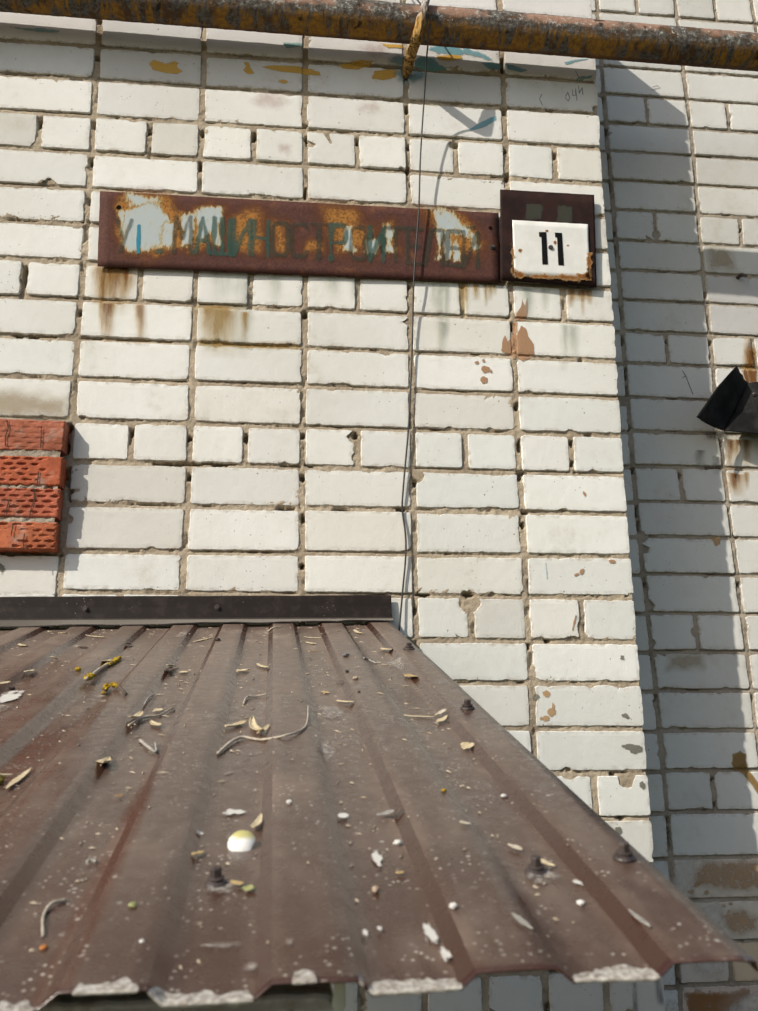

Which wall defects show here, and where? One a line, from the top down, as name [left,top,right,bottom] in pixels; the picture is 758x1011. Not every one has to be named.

corrosion [97,267,129,326]
corrosion [200,305,298,348]